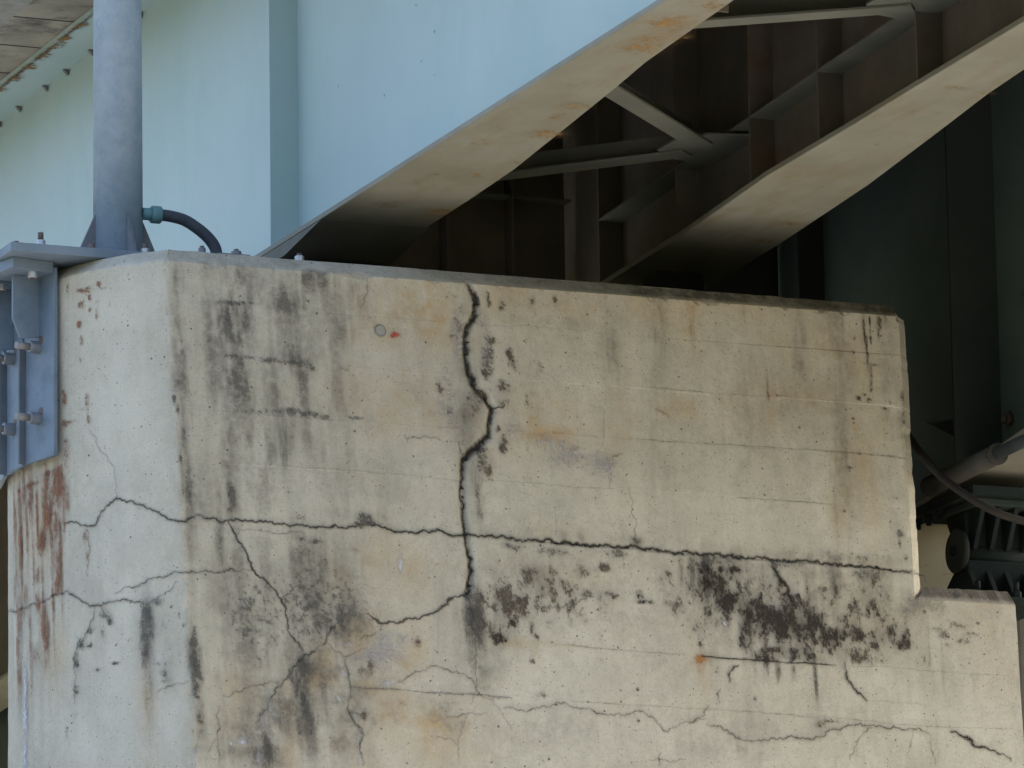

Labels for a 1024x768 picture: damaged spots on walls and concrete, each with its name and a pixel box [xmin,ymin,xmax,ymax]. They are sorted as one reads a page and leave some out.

corrosion [13,440,68,694]
crack [9,284,936,760]
mould [466,569,591,645]
damp [666,556,911,695]
crack [951,731,1011,760]